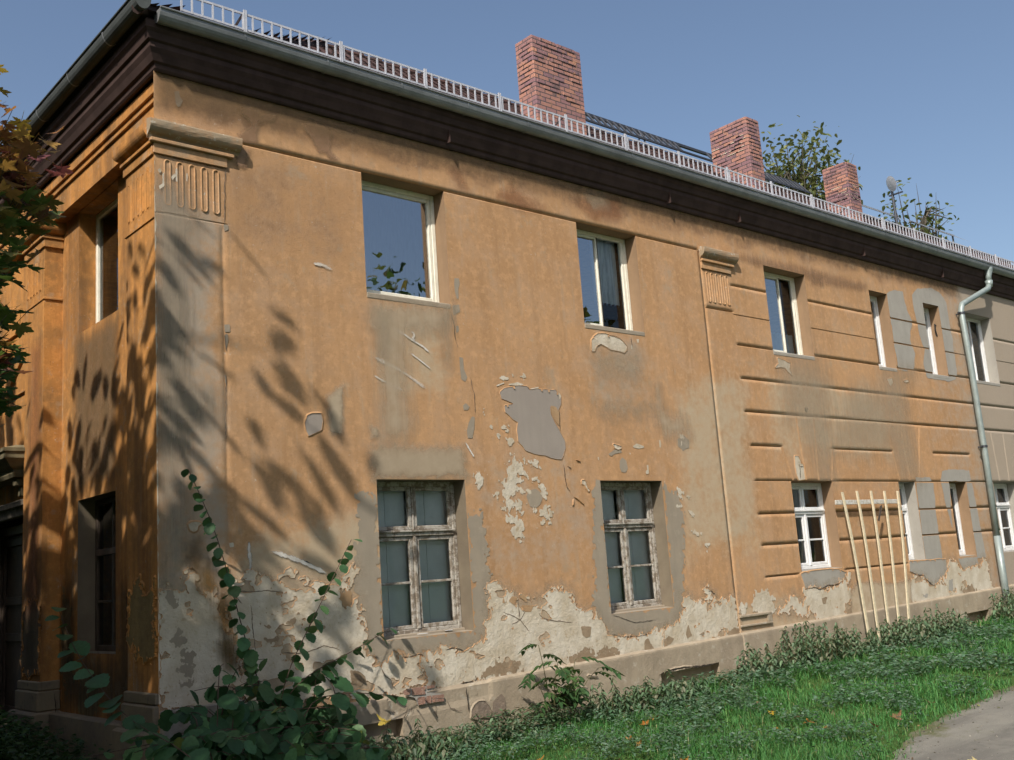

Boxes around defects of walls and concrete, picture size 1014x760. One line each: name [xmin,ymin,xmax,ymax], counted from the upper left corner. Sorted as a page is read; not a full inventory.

peeling [590,332,639,354]
peeling [496,373,561,425]
peeling [473,471,484,490]
peeling [483,408,554,543]
flaking render [794,455,806,481]
peeling [125,557,994,710]